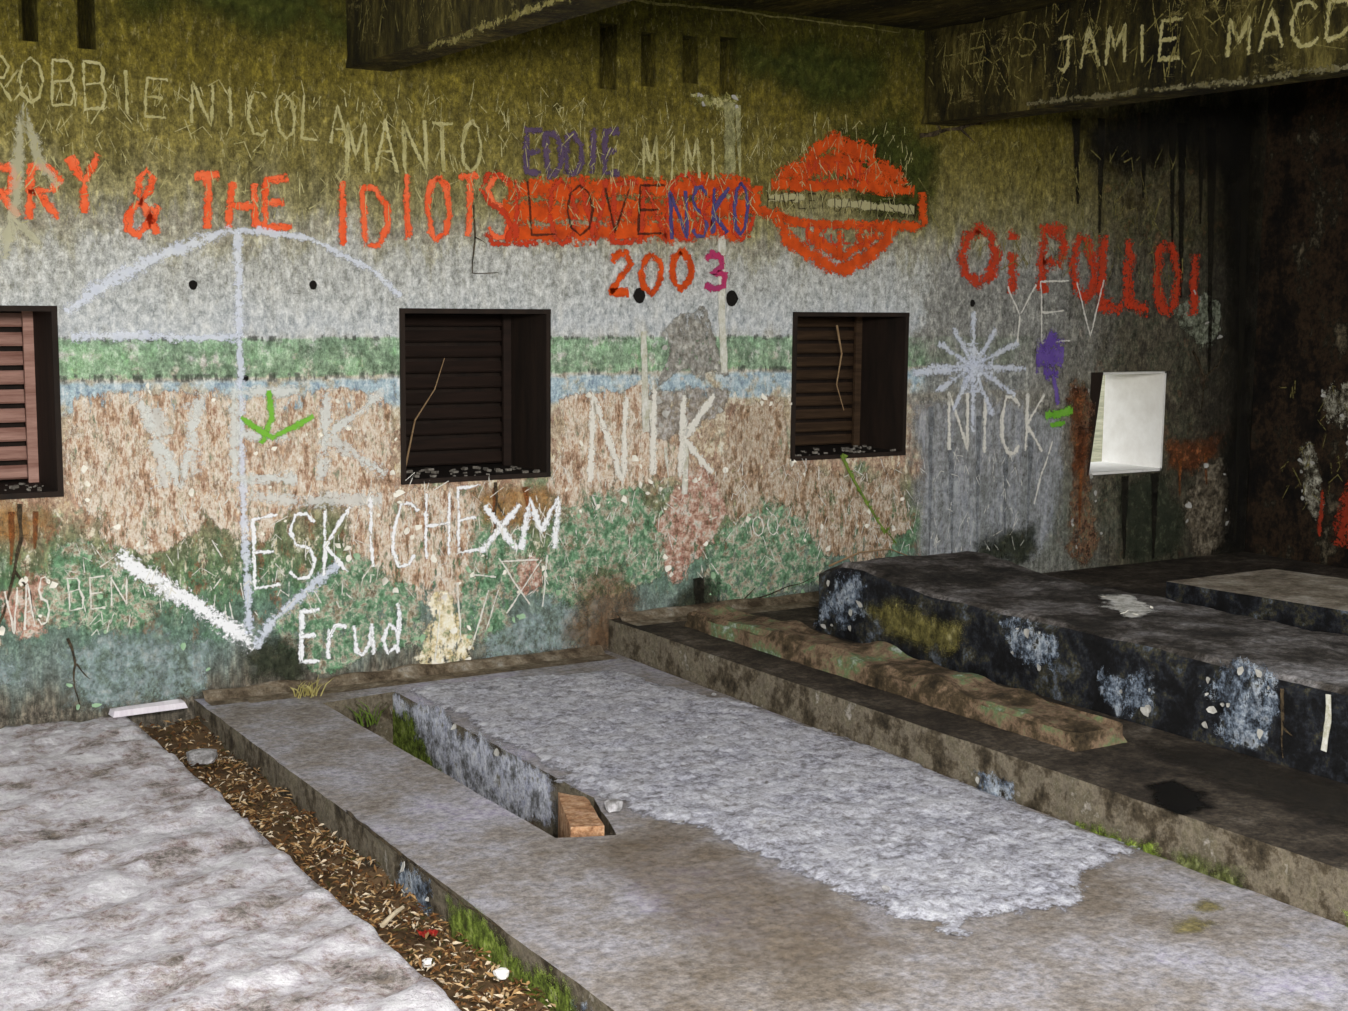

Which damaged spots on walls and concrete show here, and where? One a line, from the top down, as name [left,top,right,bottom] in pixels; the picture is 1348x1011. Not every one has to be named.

leakage [1072,118,1080,204]
leakage [1097,118,1105,235]
leakage [1169,107,1217,372]
corrosion [1069,389,1089,529]
crack [0,504,35,624]
crack [66,638,90,708]